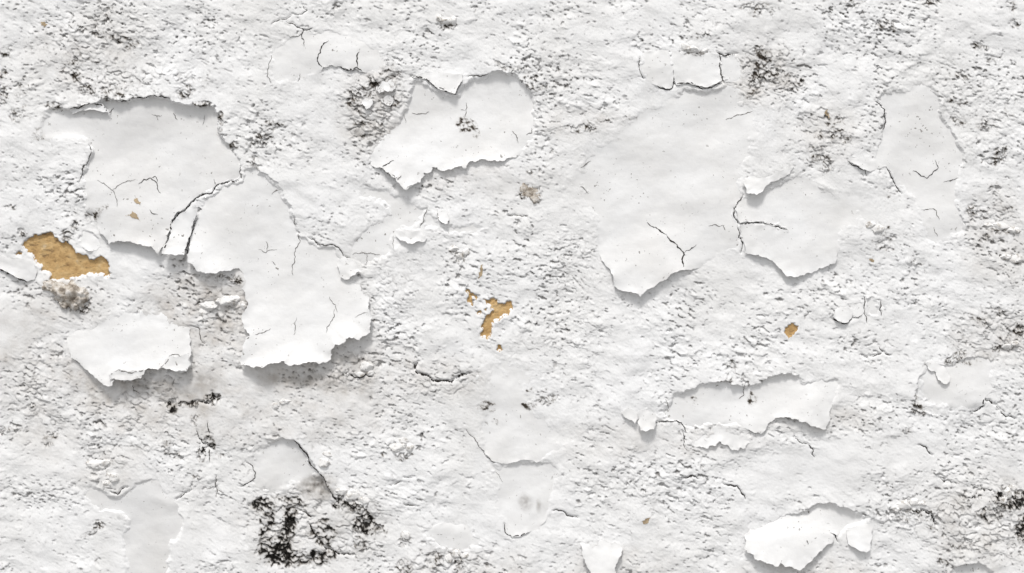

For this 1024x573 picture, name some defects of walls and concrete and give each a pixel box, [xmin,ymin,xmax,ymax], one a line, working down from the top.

crack [80,147,242,255]
peeling [0,72,535,368]
crack [710,195,787,251]
peeling [563,49,963,297]
peeling [66,308,192,386]
peeling [465,290,576,537]
peeling [621,374,838,451]
mould [252,496,385,567]
peeling [744,503,873,571]